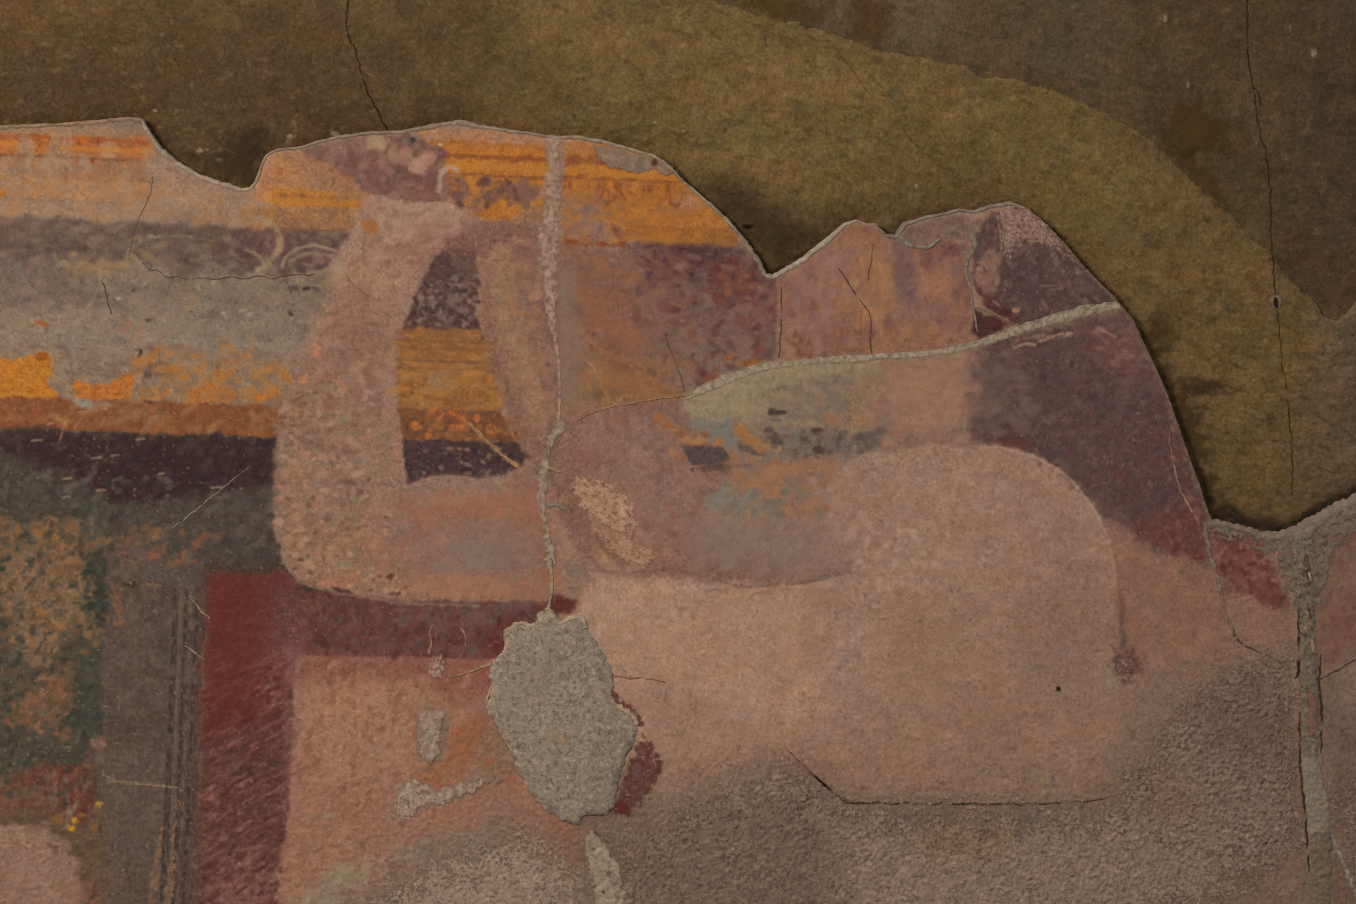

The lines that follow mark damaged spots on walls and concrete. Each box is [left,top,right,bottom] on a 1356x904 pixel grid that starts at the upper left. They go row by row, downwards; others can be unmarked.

crack [345,0,389,131]
flaking render [594,144,677,175]
flaking render [1000,204,1062,259]
crack [1246,0,1293,495]
crack [536,135,1120,612]
crack [1320,659,1356,679]
flaking render [415,706,446,765]
flaking render [391,776,489,825]
peeling [611,691,661,817]
crack [787,750,1105,806]